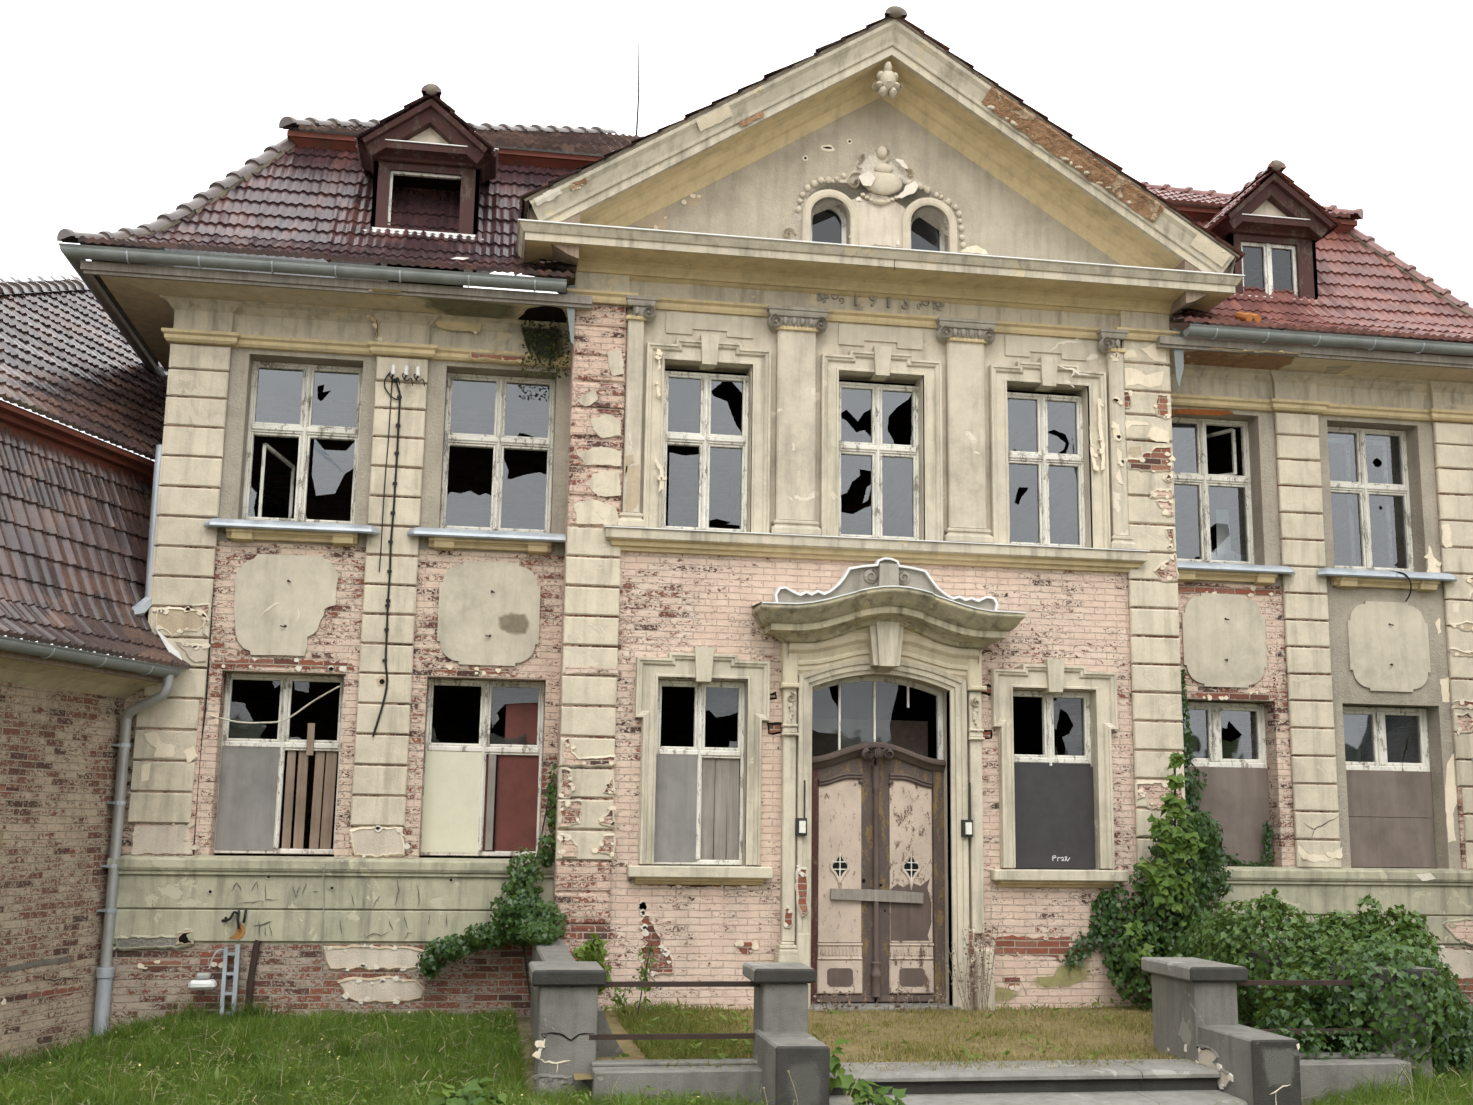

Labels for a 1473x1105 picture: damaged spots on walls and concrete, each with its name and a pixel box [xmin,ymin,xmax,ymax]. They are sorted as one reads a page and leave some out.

spalling [981,86,1165,223]
spalling [557,737,617,858]
spalling [636,884,755,977]